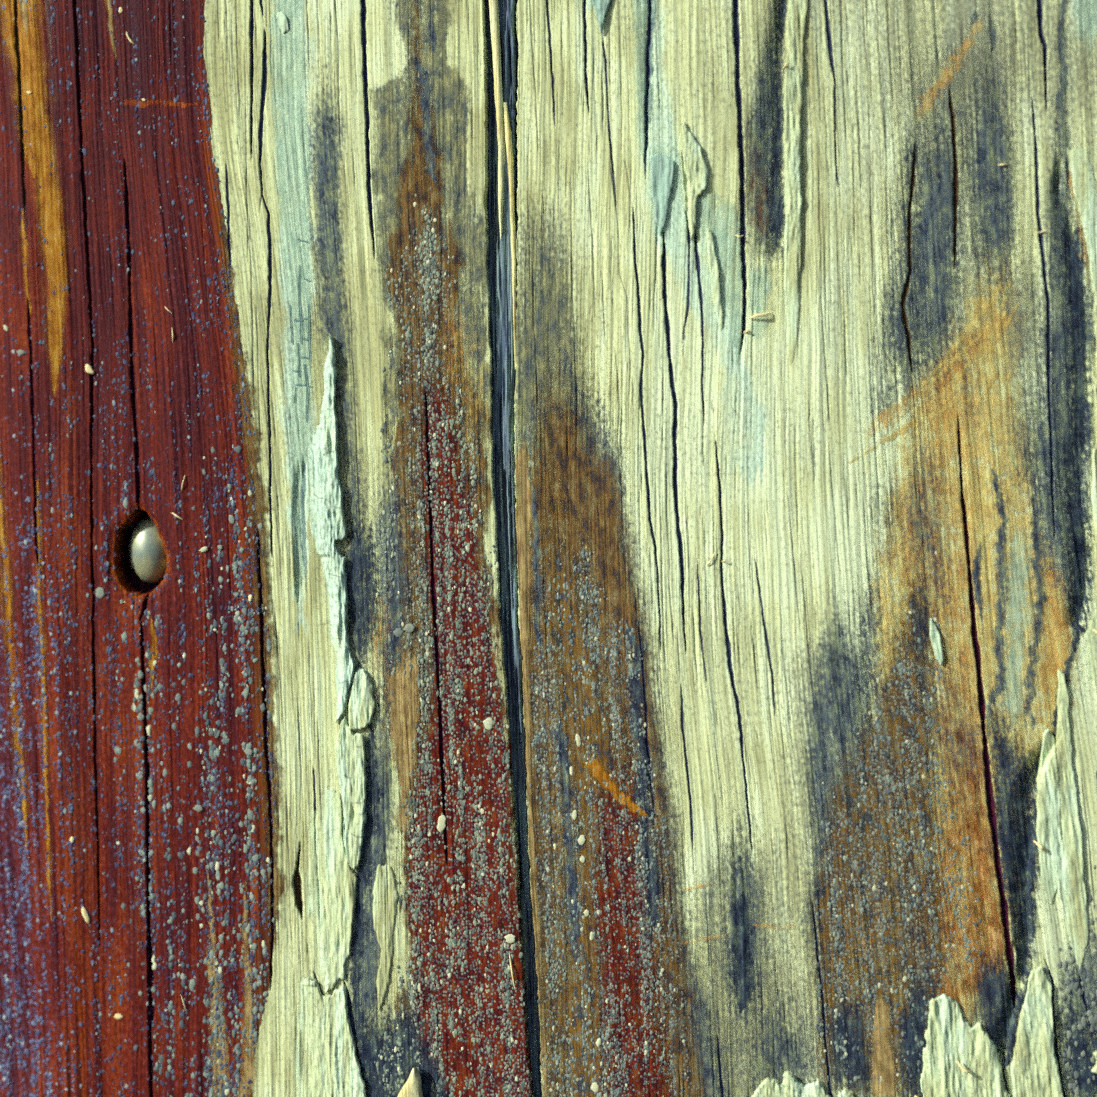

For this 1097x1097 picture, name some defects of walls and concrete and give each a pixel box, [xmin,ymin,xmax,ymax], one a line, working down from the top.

peeling [0,0,287,1097]
peeling [269,0,376,1097]
crack [361,0,375,253]
crack [546,0,555,124]
crack [583,0,752,847]
damp [308,0,1097,1097]
crack [949,89,959,267]
crack [1032,0,1055,536]
peeling [373,864,398,1010]